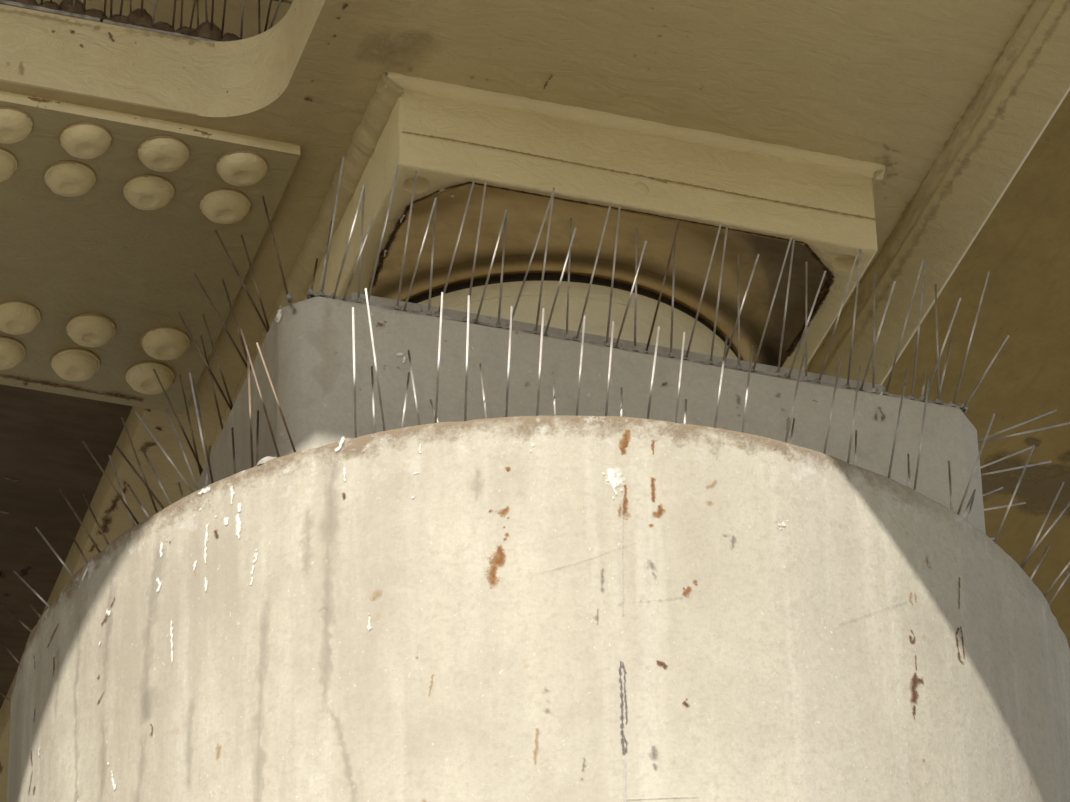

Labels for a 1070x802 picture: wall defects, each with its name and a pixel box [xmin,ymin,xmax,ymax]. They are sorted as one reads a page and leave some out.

rust [619,430,630,454]
rust [618,485,628,519]
rust [649,477,663,527]
damp [981,453,1070,514]
rust [487,507,509,586]
rust [909,630,924,719]
crack [619,661,627,754]